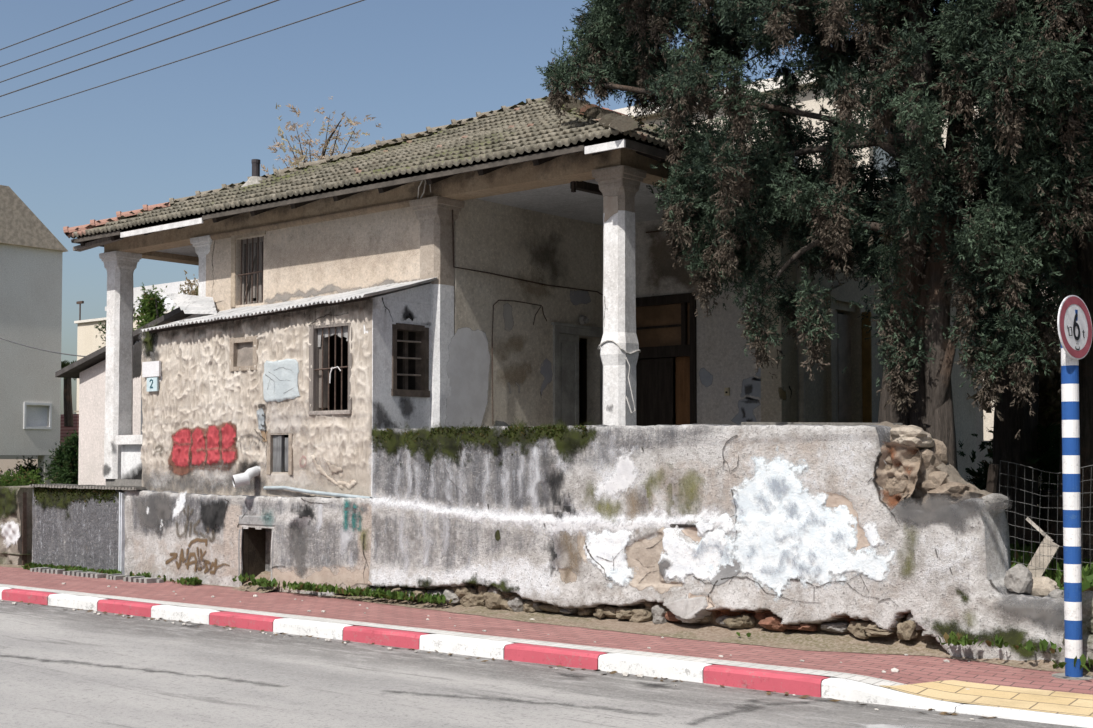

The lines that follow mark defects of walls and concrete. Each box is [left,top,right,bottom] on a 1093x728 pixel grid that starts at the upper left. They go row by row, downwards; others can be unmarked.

leakage [374,404,397,429]
leakage [400,398,413,415]
peeling [732,368,761,425]
leakage [123,463,232,538]
leakage [289,505,322,576]
leakage [372,447,722,579]
spalling [558,568,577,583]
crack [722,435,740,539]
peeling [577,446,895,609]
crack [693,574,899,607]
spalling [874,425,977,506]